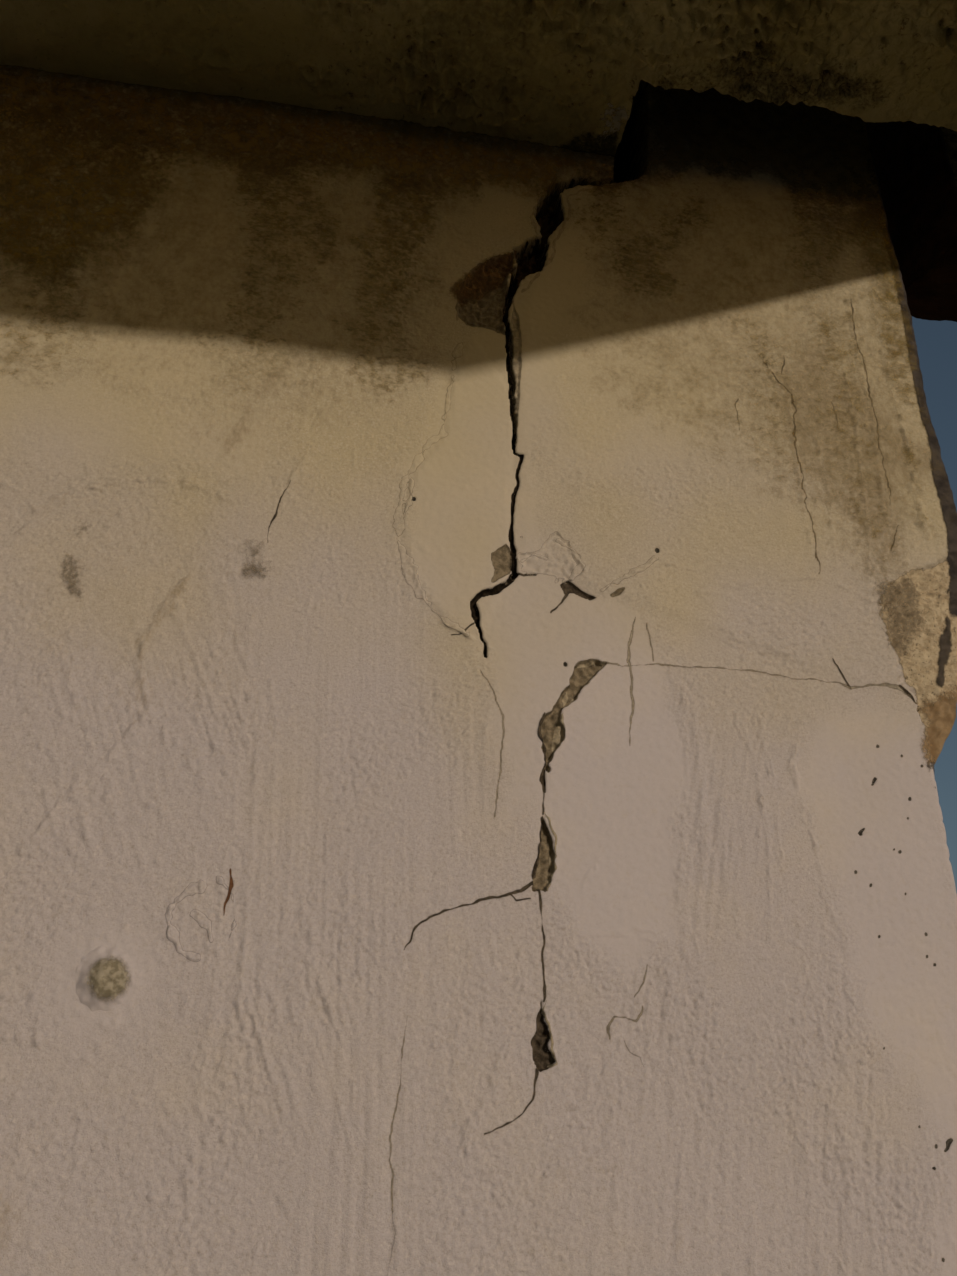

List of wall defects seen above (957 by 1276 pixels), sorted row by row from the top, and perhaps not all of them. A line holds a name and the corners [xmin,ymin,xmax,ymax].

leakage [0,54,914,403]
flaking render [450,252,515,335]
crack [404,95,920,1135]
spalling [865,122,957,767]
crack [389,1083,401,1213]